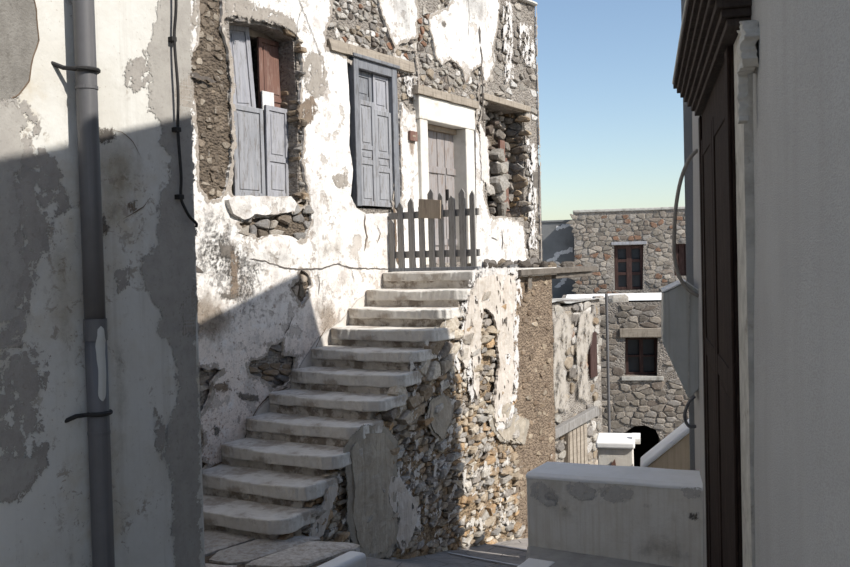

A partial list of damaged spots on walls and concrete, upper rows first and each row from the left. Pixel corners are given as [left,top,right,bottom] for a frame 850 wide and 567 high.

peeling [0,0,72,505]
crack [250,208,398,295]
peeling [114,0,543,567]